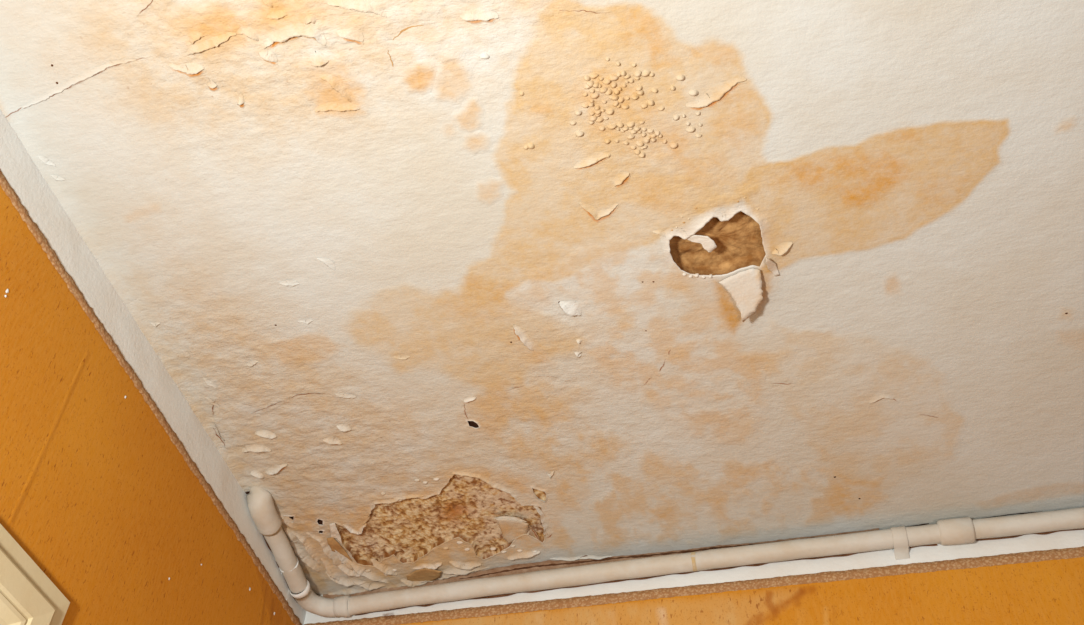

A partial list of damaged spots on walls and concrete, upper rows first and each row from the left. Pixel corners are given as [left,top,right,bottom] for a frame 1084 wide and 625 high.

crack [6,56,152,118]
peeling [169,0,364,112]
water stain [146,0,447,76]
peeling [460,8,499,25]
water stain [261,0,1015,560]
flaking render [277,471,554,591]